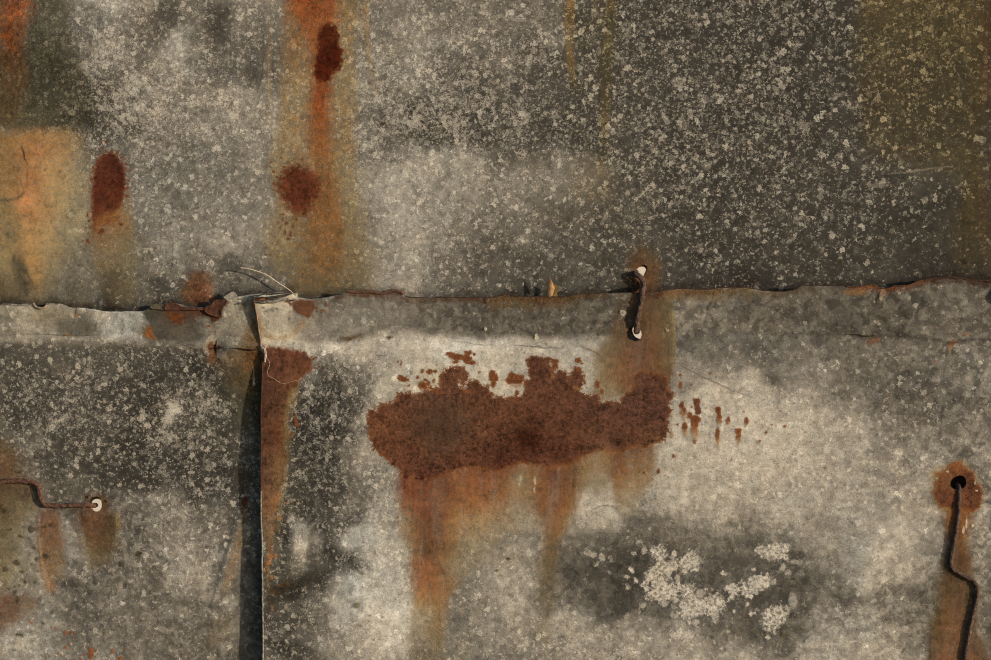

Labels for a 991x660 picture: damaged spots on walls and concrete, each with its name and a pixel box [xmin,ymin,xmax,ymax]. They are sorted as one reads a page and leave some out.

corrosion [85,142,131,246]
corrosion [270,0,345,278]
corrosion [0,443,64,628]
corrosion [79,496,117,564]
corrosion [232,292,607,579]
corrosion [366,254,776,634]
corrosion [929,461,989,660]